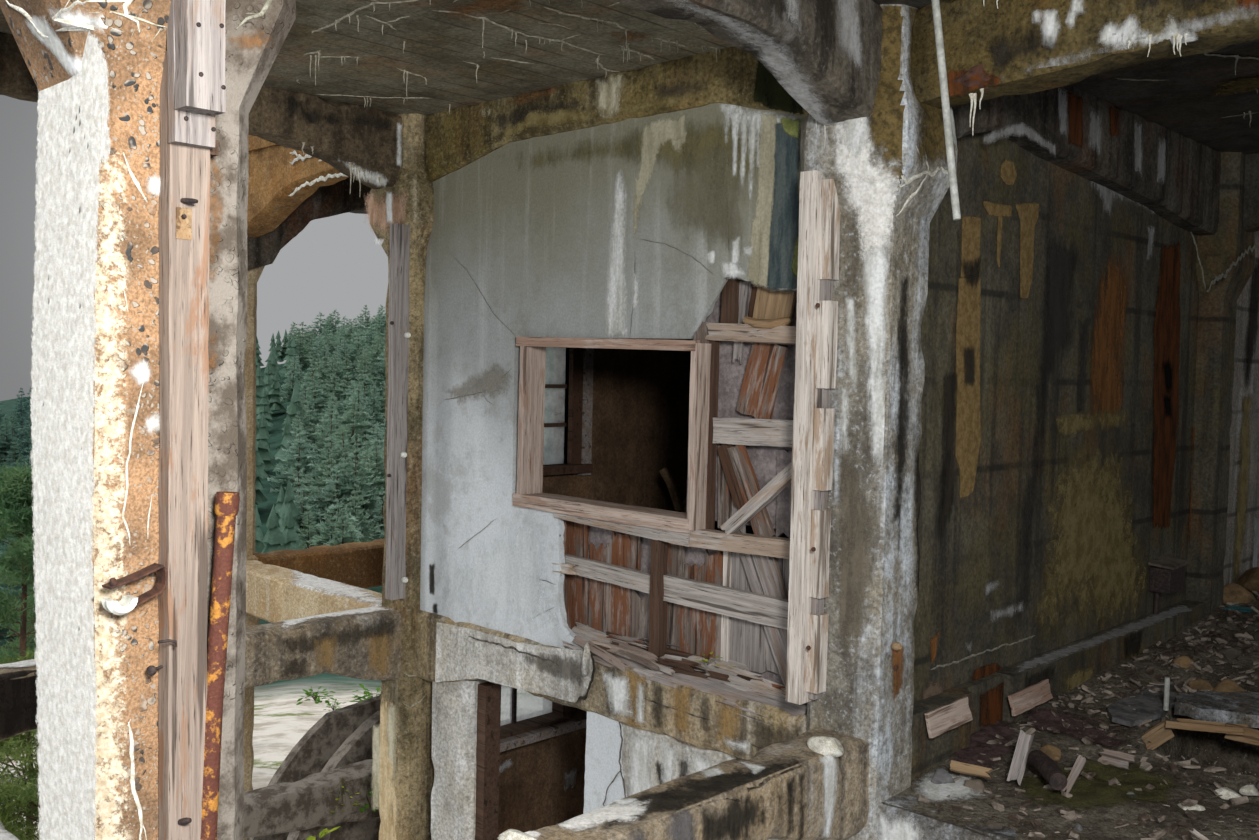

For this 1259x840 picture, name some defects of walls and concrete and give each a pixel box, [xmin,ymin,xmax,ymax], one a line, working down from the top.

crack [5,0,166,42]
crack [236,0,272,29]
crack [296,0,721,114]
damp [1034,0,1083,46]
damp [1100,19,1196,57]
damp [1059,90,1067,133]
damp [984,123,1055,154]
damp [1134,123,1142,171]
damp [1157,140,1166,181]
damp [493,76,801,337]
damp [842,299,857,447]
flaking render [556,609,571,636]